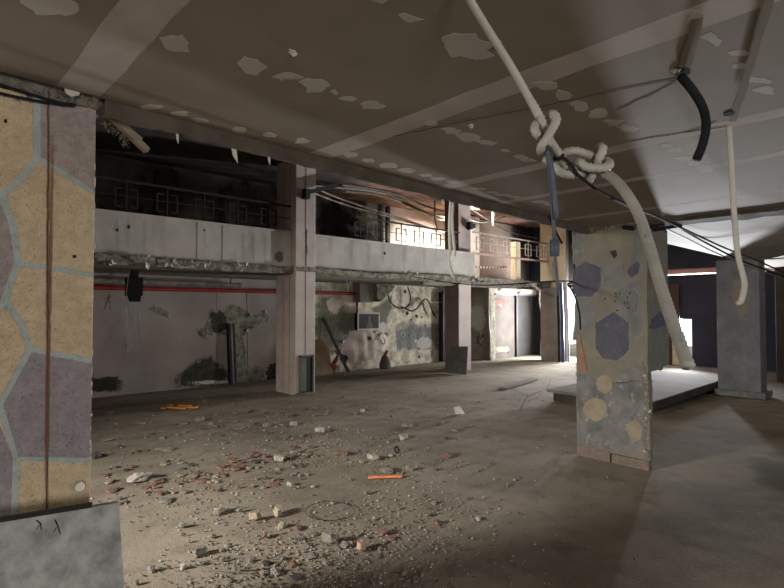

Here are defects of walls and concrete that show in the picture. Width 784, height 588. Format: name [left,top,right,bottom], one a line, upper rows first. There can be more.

spalling [130,253,212,270]
peeling [177,304,276,387]
leakage [316,299,355,347]
leakage [373,296,392,334]
leakage [396,322,439,349]
flaking render [577,331,587,371]